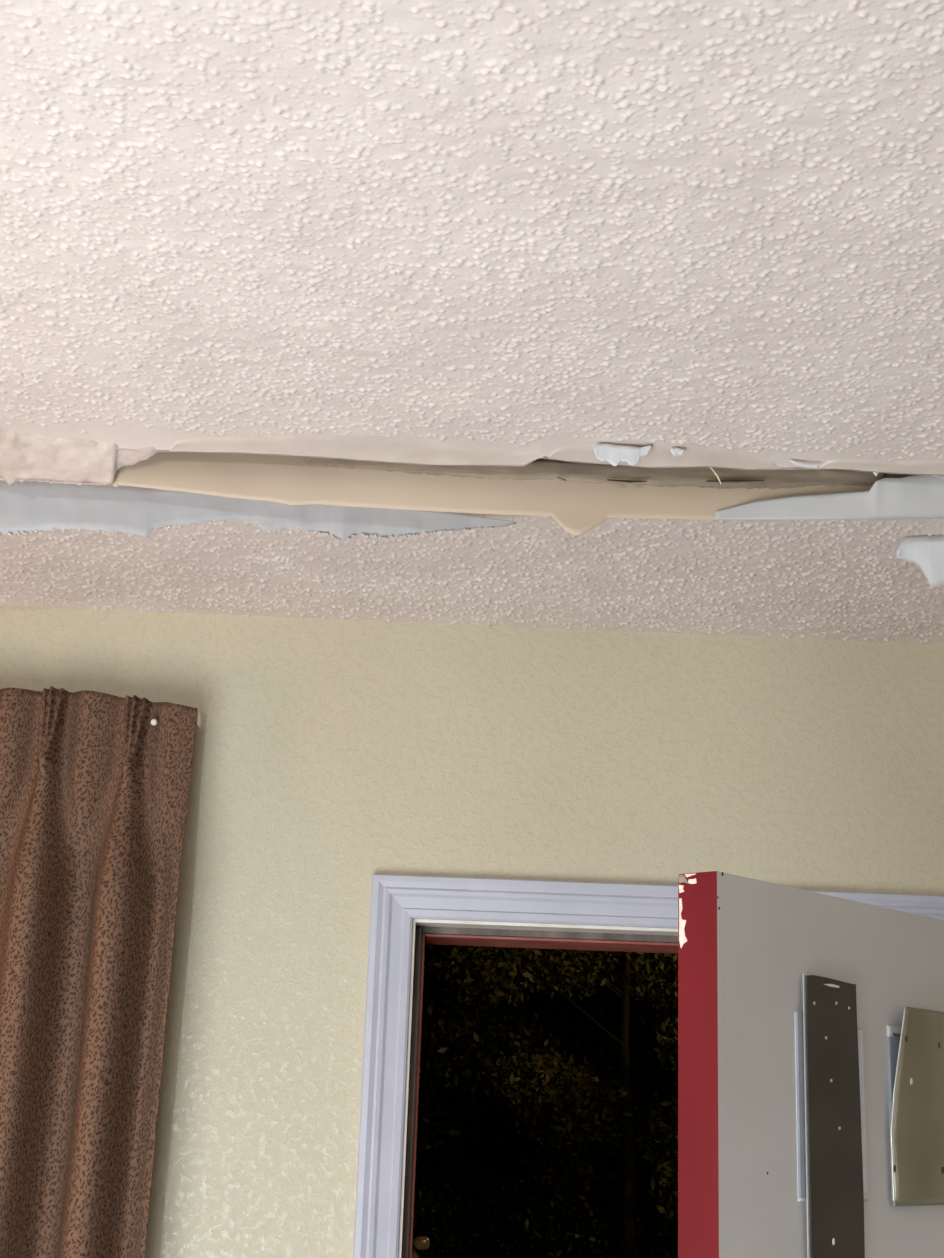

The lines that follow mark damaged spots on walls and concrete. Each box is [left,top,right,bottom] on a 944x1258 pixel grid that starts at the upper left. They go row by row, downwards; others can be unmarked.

crack [117,448,944,484]
peeling [170,434,944,476]